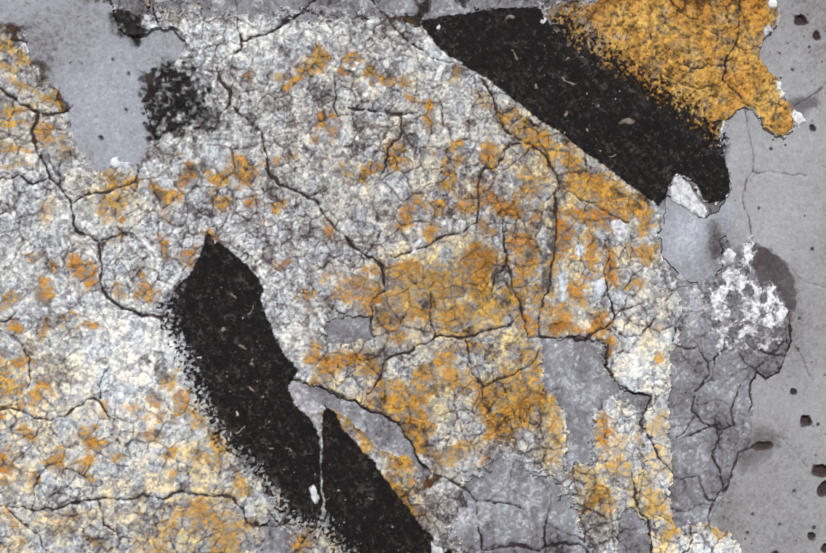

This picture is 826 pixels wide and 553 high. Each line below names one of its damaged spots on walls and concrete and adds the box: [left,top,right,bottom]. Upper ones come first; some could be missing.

crack [235,0,316,53]
peeling [0,0,568,171]
crack [371,0,451,63]
crack [665,0,742,99]
peeling [790,110,806,128]
crack [0,88,173,319]
peeling [670,175,708,218]
crack [211,67,792,553]
crack [2,370,110,421]
peeling [448,335,652,553]
peeling [662,241,797,528]
crack [0,474,296,547]